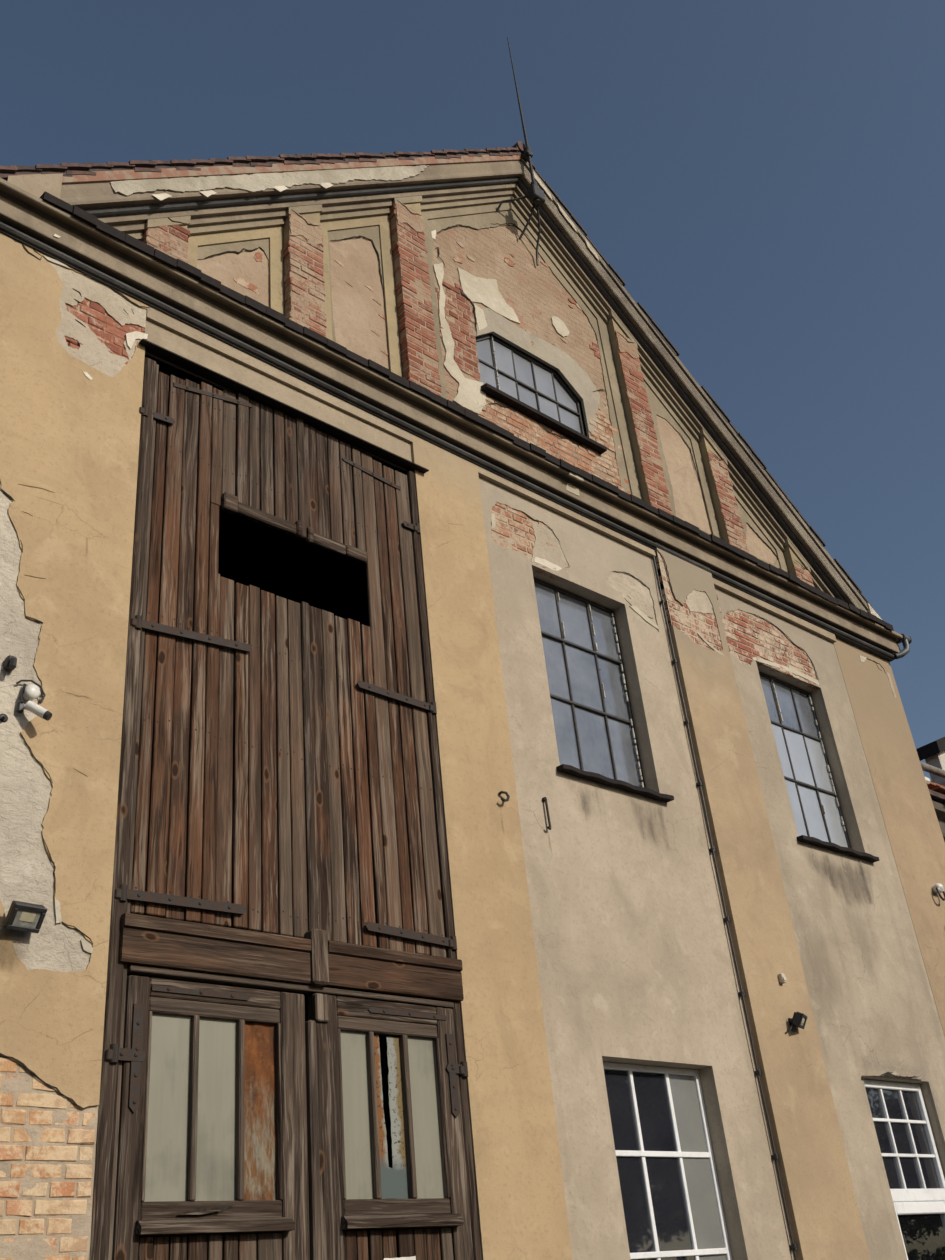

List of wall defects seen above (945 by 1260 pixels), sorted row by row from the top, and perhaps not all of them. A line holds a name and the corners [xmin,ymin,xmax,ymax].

peeling [110,165,429,201]
spalling [42,255,149,380]
flaking render [141,200,631,496]
flaking render [615,330,778,564]
spalling [491,502,569,580]
spalling [606,551,819,690]
flaking render [0,481,93,972]
flaking render [0,1053,99,1260]
rust [243,1022,276,1201]